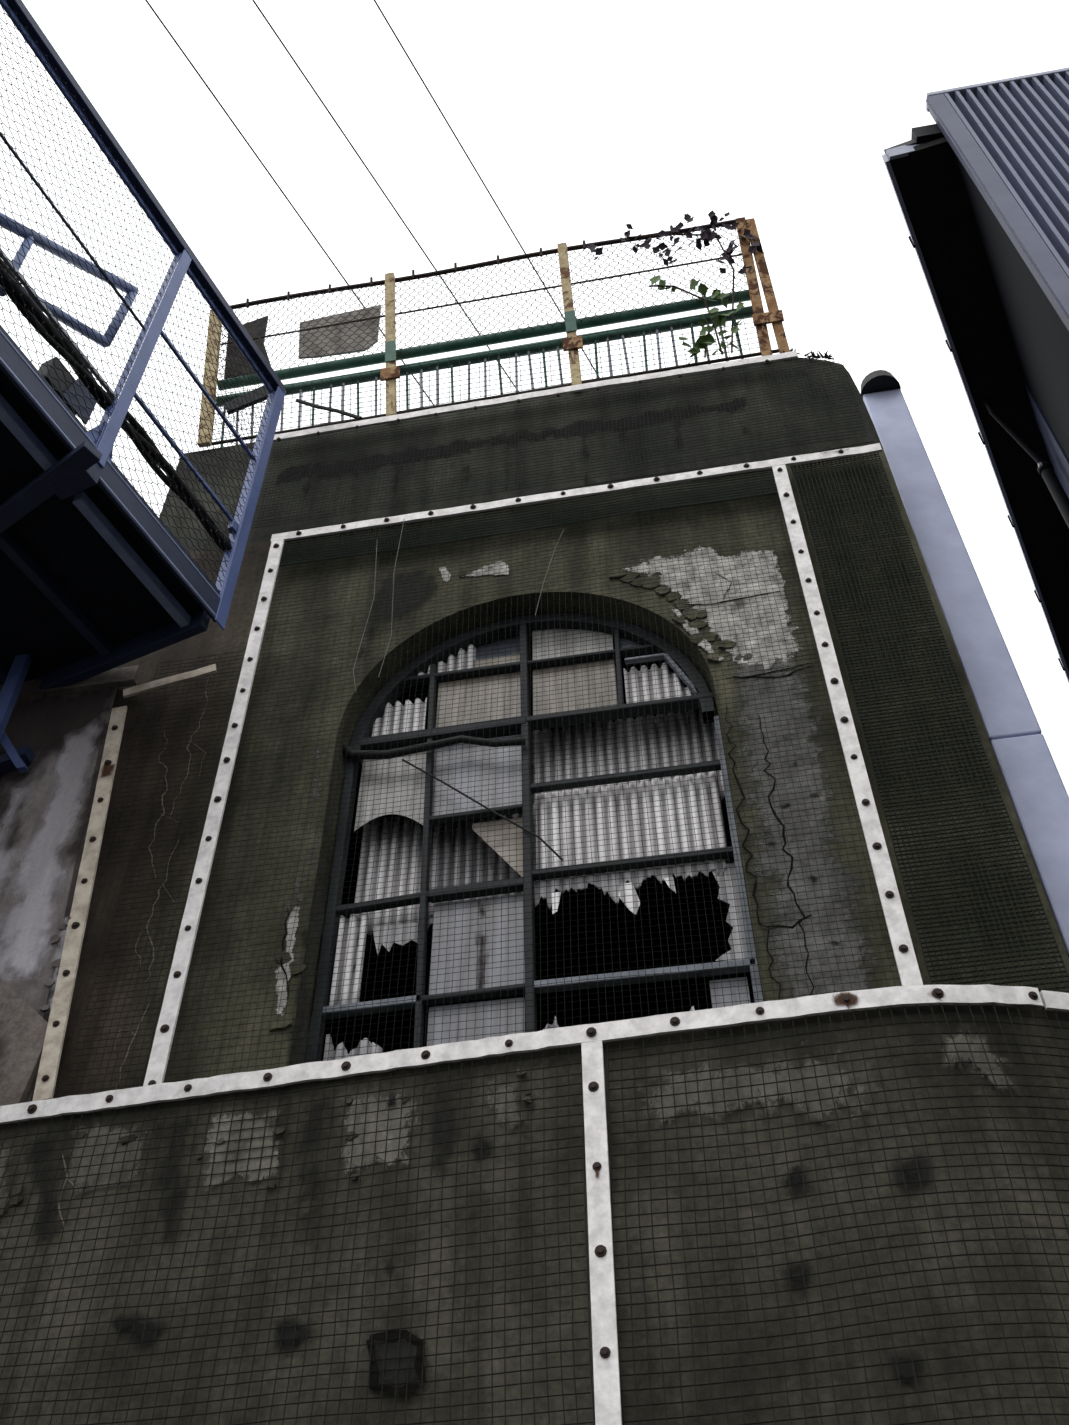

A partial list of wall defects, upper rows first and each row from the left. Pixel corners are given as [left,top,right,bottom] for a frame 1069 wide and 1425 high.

spalling [439,560,509,582]
peeling [609,546,877,1000]
damp [0,688,116,980]
peeling [269,880,307,1032]
corrosion [834,992,858,1008]
spalling [638,1041,881,1126]
spalling [941,1031,1015,1090]
spalling [366,1330,426,1396]